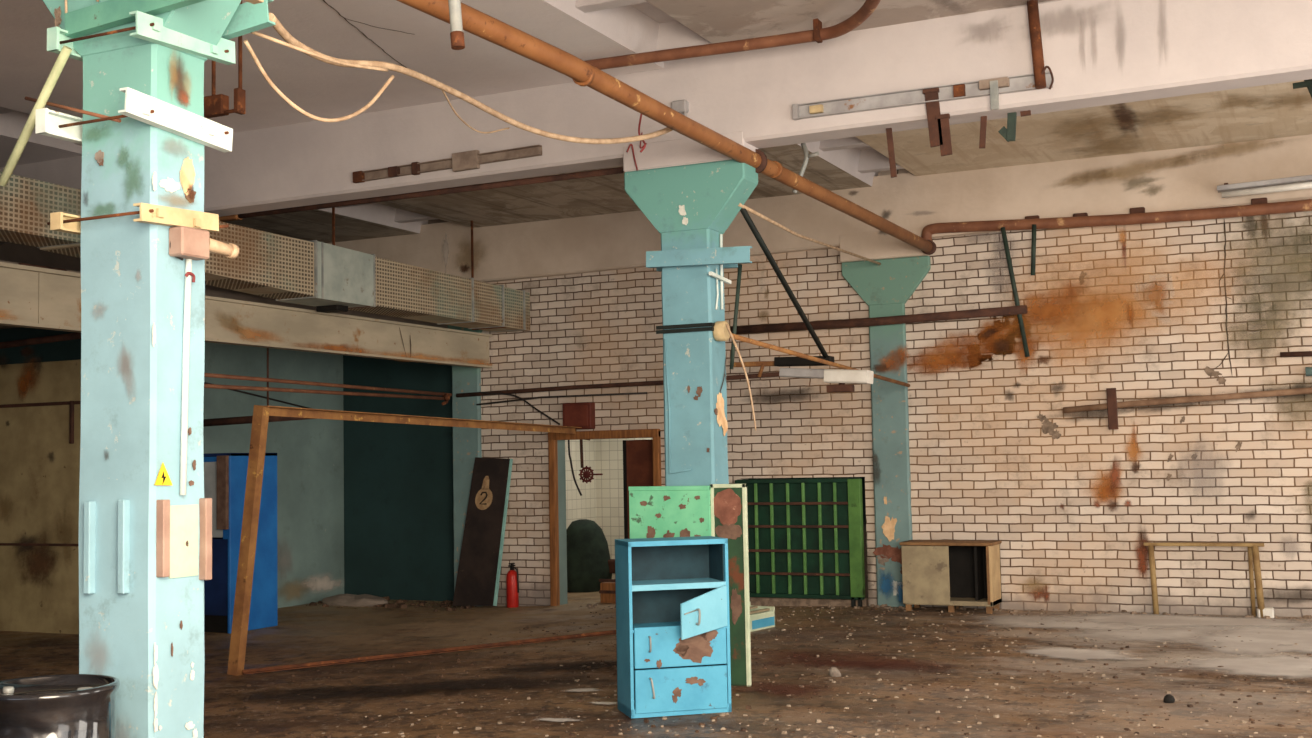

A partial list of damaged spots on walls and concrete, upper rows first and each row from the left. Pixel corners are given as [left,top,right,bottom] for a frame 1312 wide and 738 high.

rust [173,59,189,104]
leakage [1115,103,1135,130]
rust [874,287,1133,372]
peeling [687,385,728,436]
rust [1093,432,1139,509]
peeling [873,497,902,595]
rust [1137,531,1148,573]